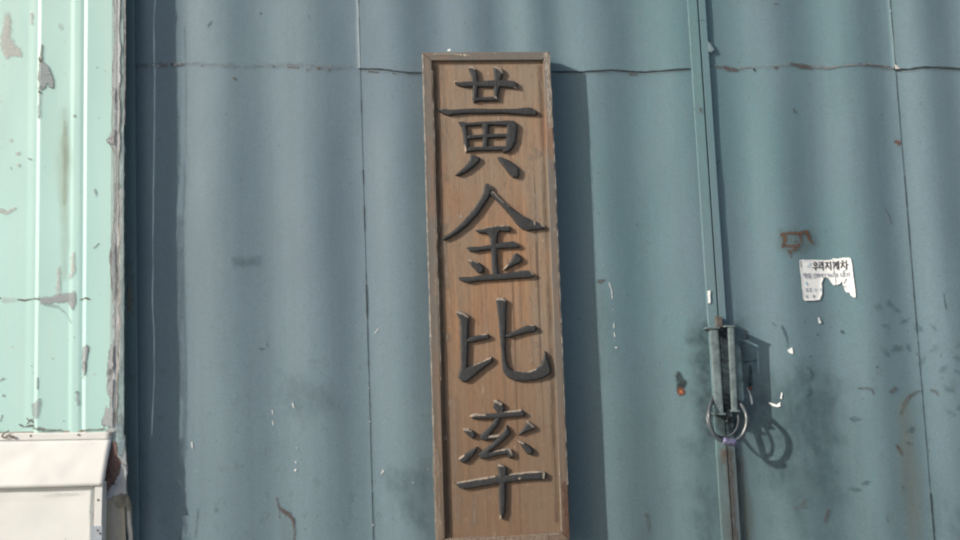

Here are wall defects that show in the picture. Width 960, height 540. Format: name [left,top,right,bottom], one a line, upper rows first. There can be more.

peeling [1,14,21,58]
peeling [38,45,54,104]
peeling [81,0,127,499]
rust [780,230,814,252]
rust [676,372,686,395]
peeling [19,401,64,432]